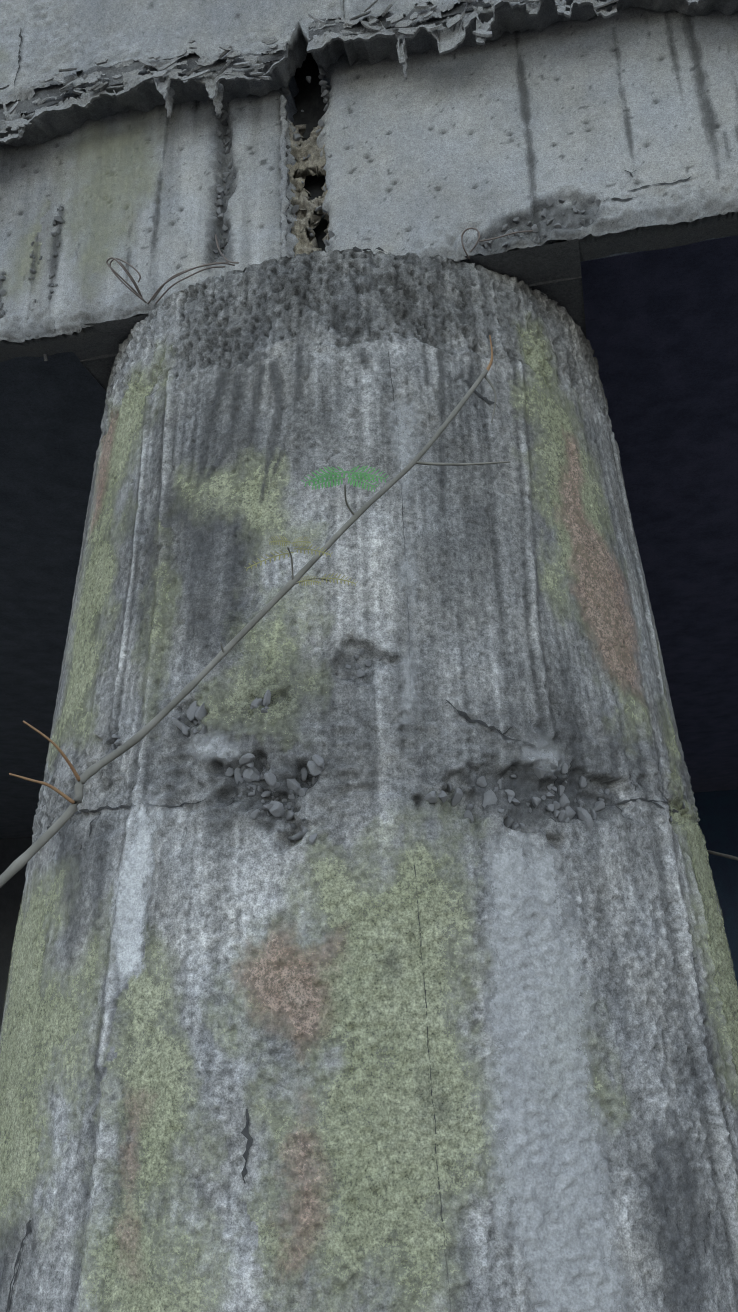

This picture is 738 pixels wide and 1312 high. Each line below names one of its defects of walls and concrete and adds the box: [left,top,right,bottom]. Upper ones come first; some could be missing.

flaking render [307,0,620,65]
damp [31,223,61,287]
flaking render [0,36,288,263]
crack [281,105,291,241]
spalling [477,197,601,251]
crack [465,380,499,408]
crack [388,352,412,704]
corrosion [561,438,637,688]
crack [446,700,544,755]
corrosion [246,936,326,1039]
crack [414,865,451,1310]
crack [241,1109,253,1184]